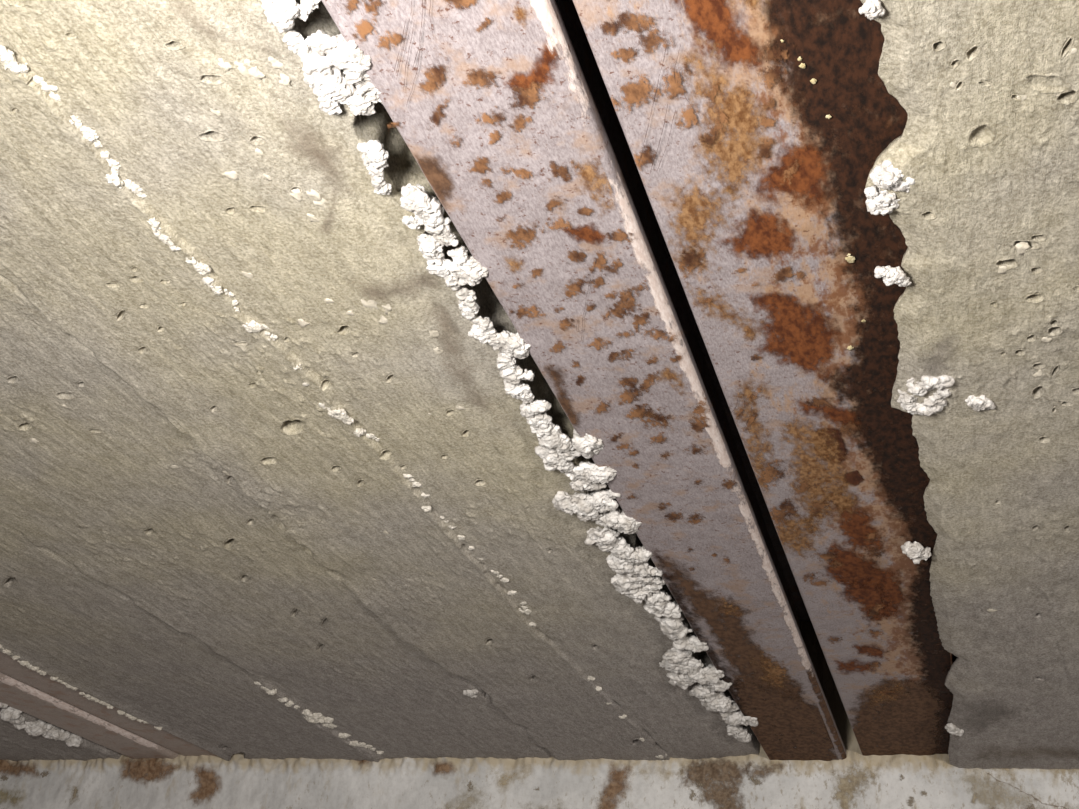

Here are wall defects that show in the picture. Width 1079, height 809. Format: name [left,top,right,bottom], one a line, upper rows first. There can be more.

corrosion [346,0,404,50]
corrosion [600,11,673,63]
corrosion [462,44,559,145]
spalling [1010,73,1079,105]
peeling [869,160,915,193]
corrosion [496,161,677,362]
spalling [994,234,1047,275]
spalling [357,139,758,743]
corrosion [596,355,683,458]
peeling [608,172,813,675]
corrosion [611,0,953,761]
peeling [906,375,955,403]